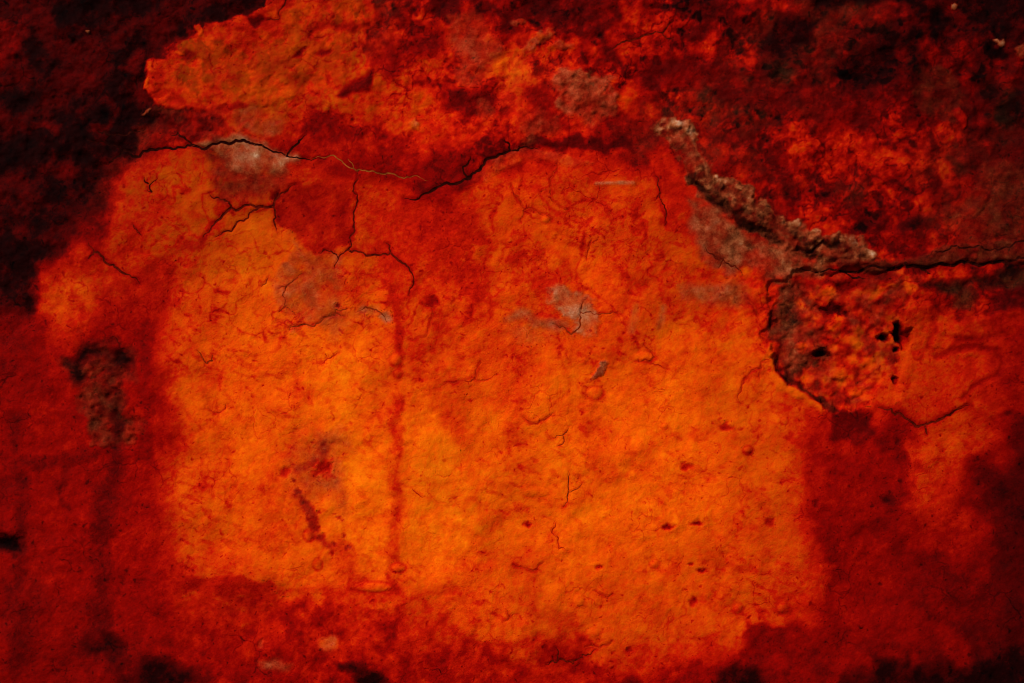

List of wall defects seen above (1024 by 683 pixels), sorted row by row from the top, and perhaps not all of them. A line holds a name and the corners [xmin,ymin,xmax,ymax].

crack [86,129,561,338]
crack [798,240,1024,279]
spalling [756,266,1024,446]